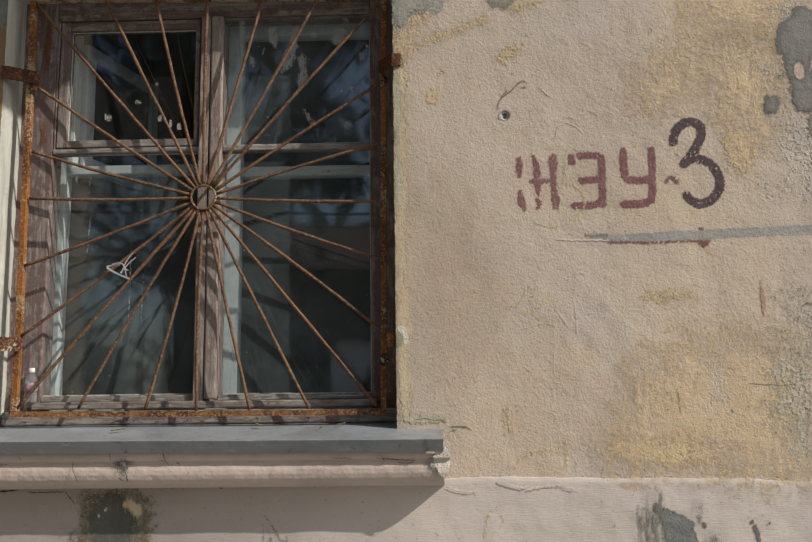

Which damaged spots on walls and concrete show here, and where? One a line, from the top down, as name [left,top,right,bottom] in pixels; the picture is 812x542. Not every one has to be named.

peeling [392,7,494,425]
peeling [615,0,812,177]